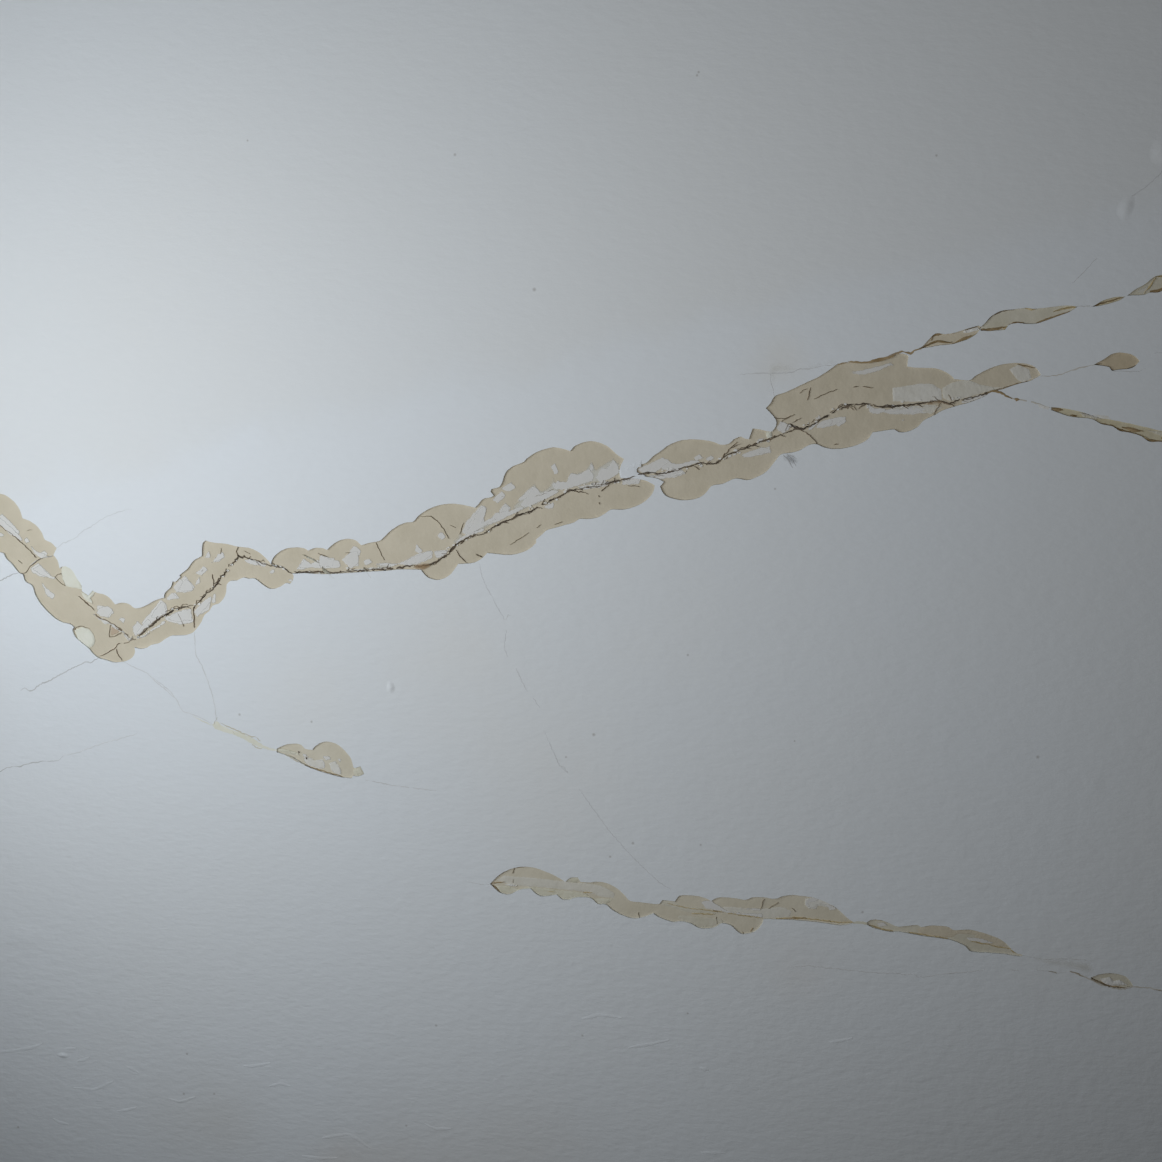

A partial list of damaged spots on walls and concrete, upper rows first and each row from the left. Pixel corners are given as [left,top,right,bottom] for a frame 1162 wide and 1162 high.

peeling [1092,275,1162,307]
peeling [921,306,1077,348]
peeling [1094,352,1139,371]
peeling [1038,404,1162,442]
peeling [0,354,1041,662]
crack [0,509,132,581]
crack [0,348,1146,888]
peeling [195,717,364,778]
peeling [491,867,1021,956]
crack [1009,955,1162,991]
peeling [1091,973,1133,988]